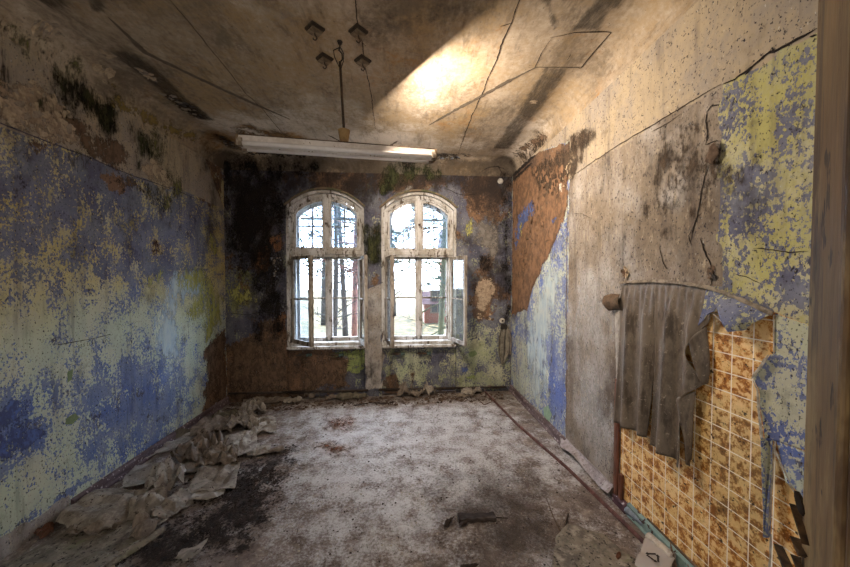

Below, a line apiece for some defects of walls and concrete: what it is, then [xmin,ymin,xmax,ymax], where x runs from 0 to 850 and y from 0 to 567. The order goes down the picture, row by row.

spalling [0,71,173,194]
crack [170,0,286,137]
damp [232,124,287,137]
crack [355,0,376,129]
damp [378,161,442,201]
crack [459,0,520,150]
damp [643,124,744,217]
damp [206,154,319,342]
spalling [475,161,572,365]
flaking render [203,333,227,401]
peeling [334,349,365,374]
spalling [647,518,698,567]